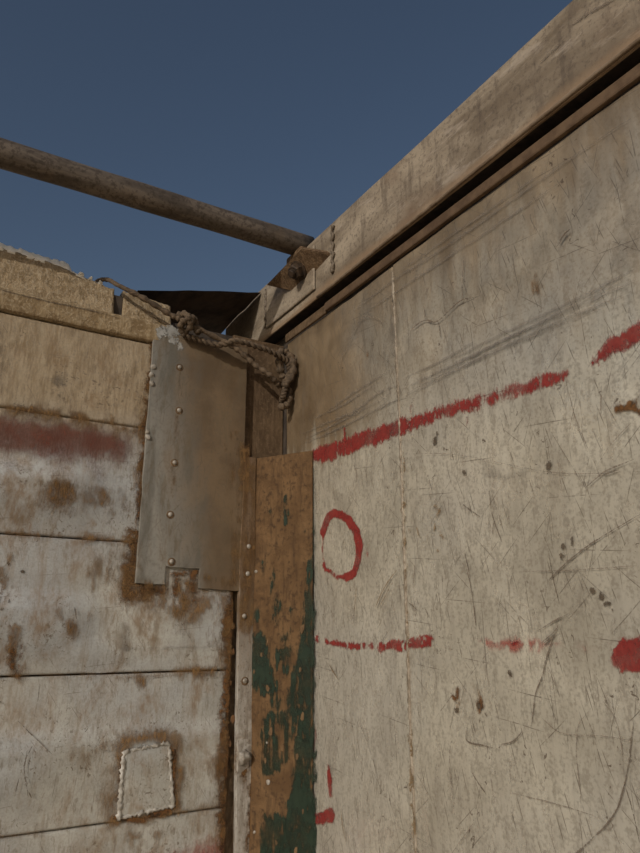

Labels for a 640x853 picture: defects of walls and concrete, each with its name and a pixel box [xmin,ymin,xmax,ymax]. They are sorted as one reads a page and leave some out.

corrosion [5,405,60,420]
corrosion [71,342,152,519]
corrosion [39,477,110,512]
corrosion [118,528,210,622]
corrosion [177,548,238,853]
peeling [252,527,317,853]
corrosion [103,728,183,840]